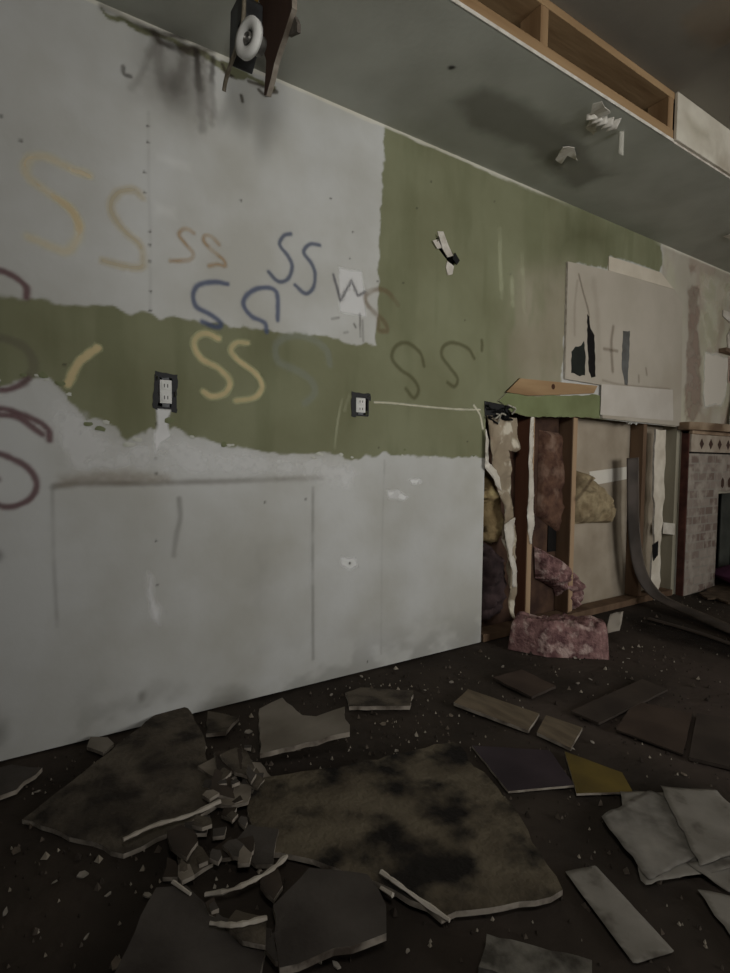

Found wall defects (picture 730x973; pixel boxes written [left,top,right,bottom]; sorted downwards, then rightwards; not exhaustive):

damp [154,32,201,90]
flaking render [686,288,701,420]
spalling [719,310,730,383]
peeling [84,420,110,432]
spalling [152,371,178,424]